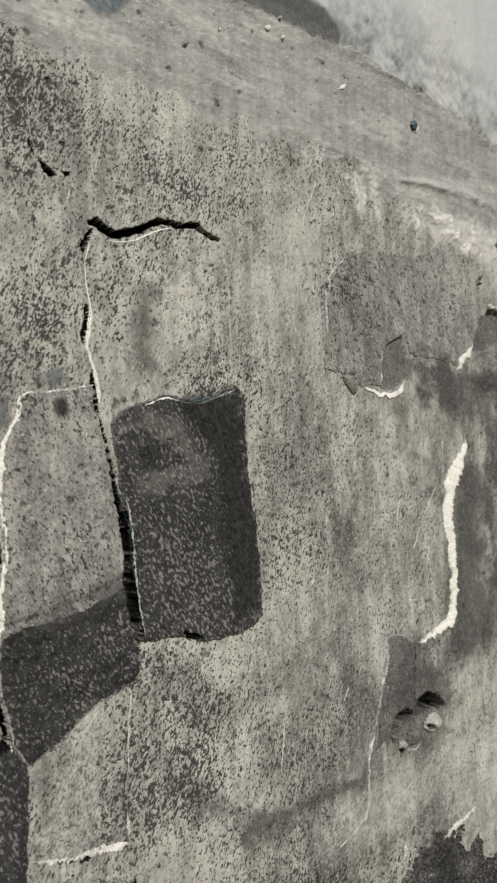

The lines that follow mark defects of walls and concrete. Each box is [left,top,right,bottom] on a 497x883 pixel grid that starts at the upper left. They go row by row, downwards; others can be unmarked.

crack [0,97,244,645]
flaking render [322,242,497,399]
crack [0,701,14,756]
peeling [0,384,263,883]